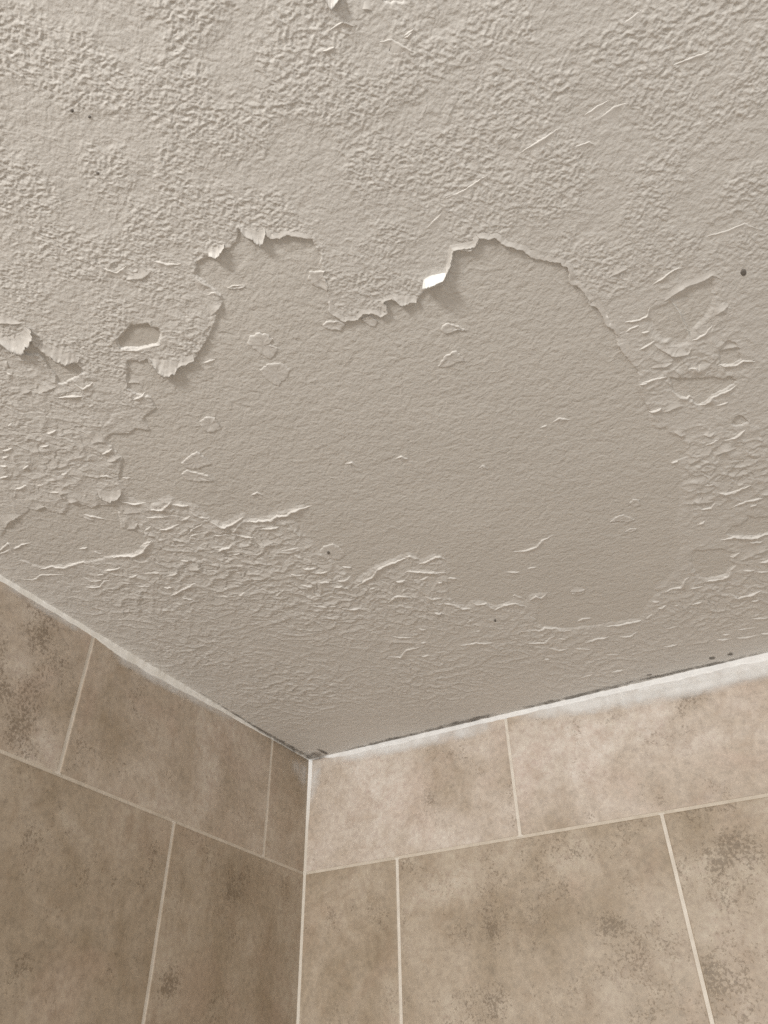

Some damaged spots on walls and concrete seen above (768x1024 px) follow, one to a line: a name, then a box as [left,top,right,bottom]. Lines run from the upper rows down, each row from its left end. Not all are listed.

peeling [0,326,84,383]
peeling [247,332,290,386]
peeling [3,489,147,567]
peeling [320,544,346,560]
peeling [691,549,733,577]